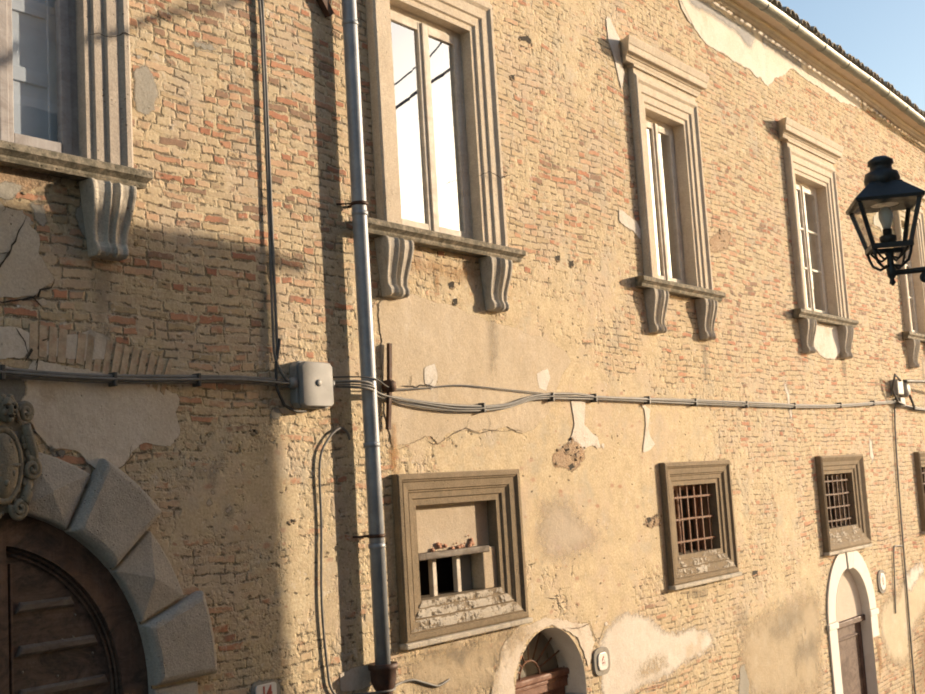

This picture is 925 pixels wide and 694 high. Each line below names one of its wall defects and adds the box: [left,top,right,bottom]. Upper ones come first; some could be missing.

peeling [679,0,870,112]
spalling [0,166,51,195]
crack [0,209,26,267]
peeling [0,202,54,305]
crack [0,279,55,307]
crack [17,330,48,370]
peeling [0,326,180,468]
crack [394,418,520,450]
peeling [552,401,604,472]
peeling [408,612,712,694]